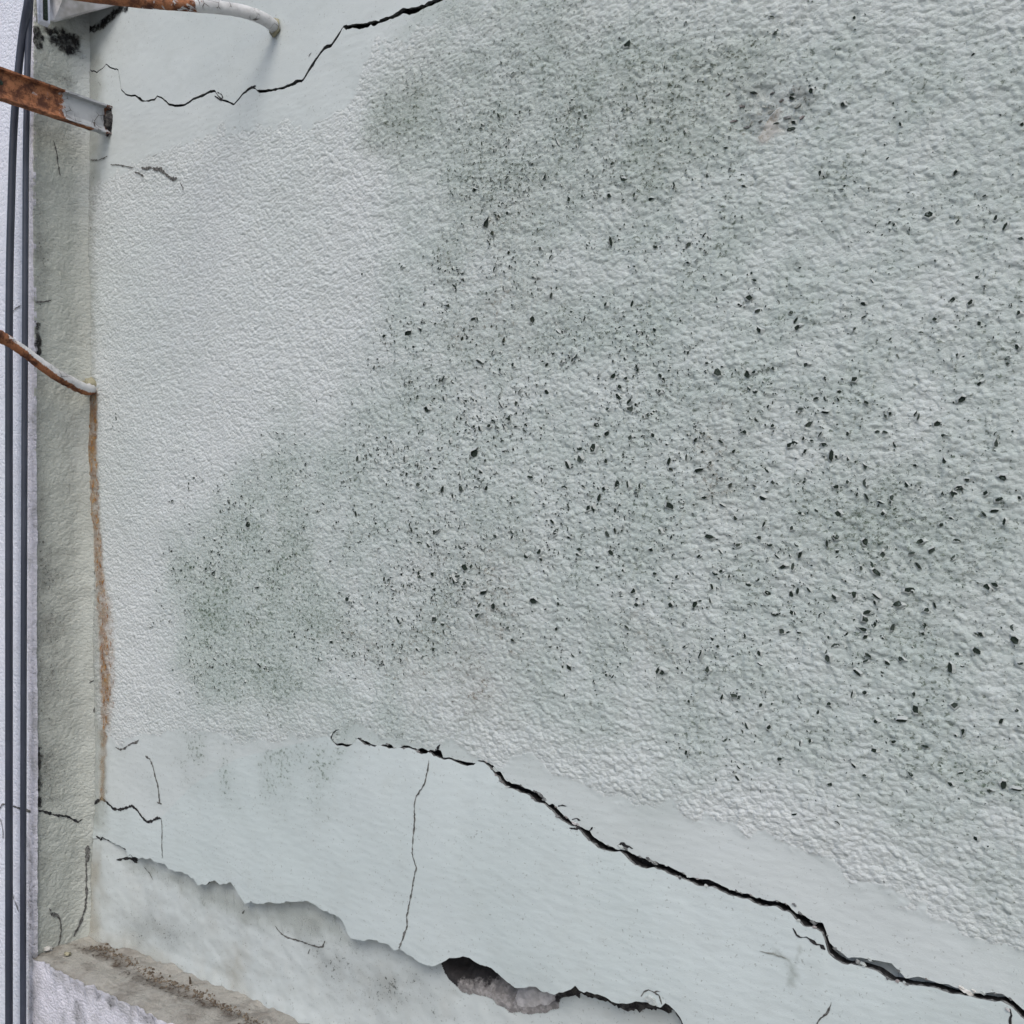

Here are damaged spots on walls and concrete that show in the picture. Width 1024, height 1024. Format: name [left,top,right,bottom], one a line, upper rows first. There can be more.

crack [90,0,443,107]
water stain [367,0,810,231]
corrosion [88,395,115,746]
mould [170,466,337,736]
crack [0,740,163,946]
crack [275,926,325,954]
flaking render [441,956,683,1024]
crack [331,729,1024,1024]